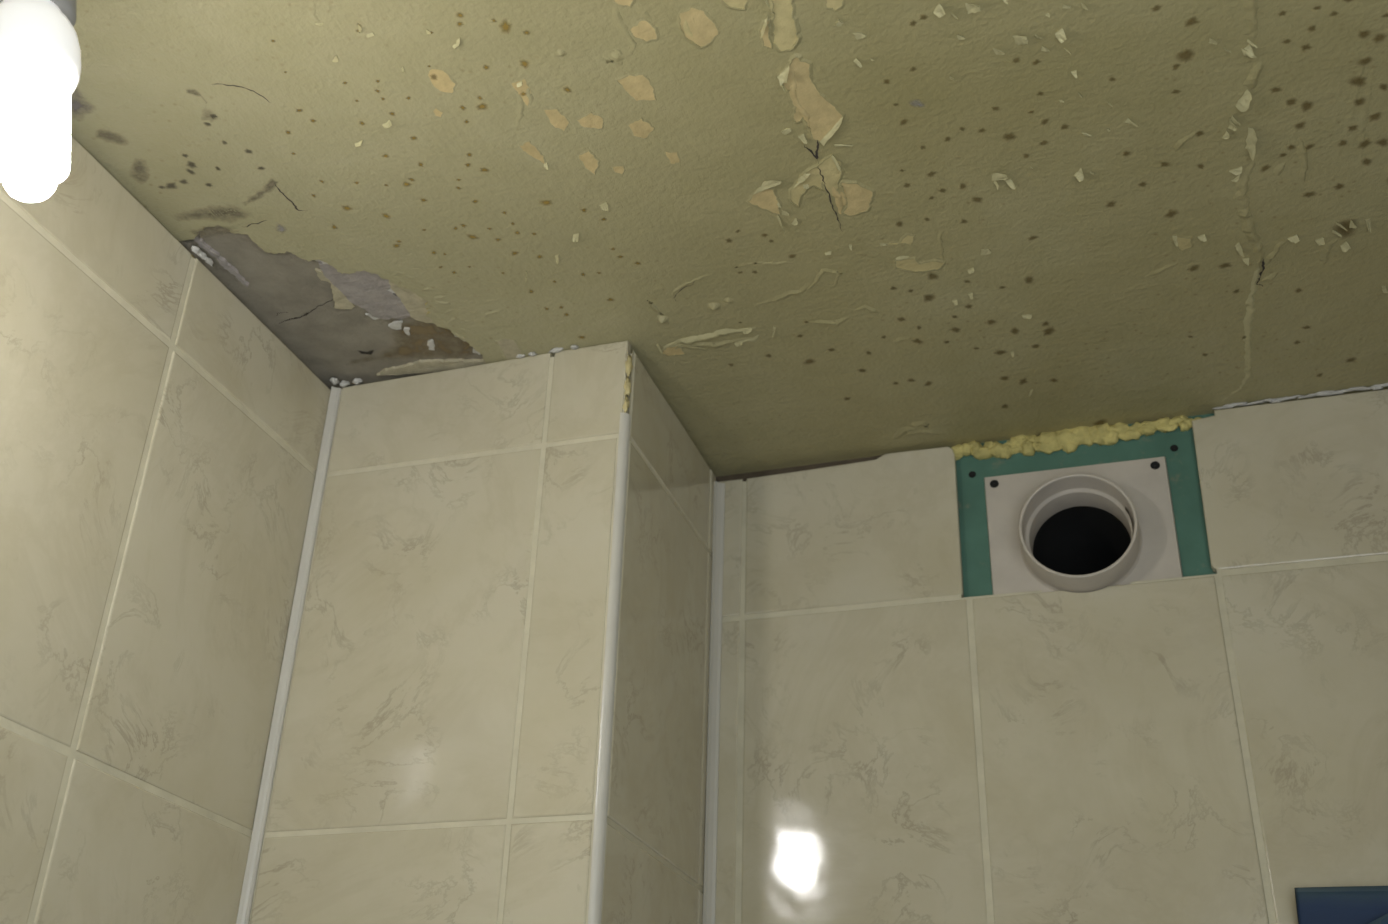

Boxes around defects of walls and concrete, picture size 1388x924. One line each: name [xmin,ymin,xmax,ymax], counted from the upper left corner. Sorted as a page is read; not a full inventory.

peeling [933,3,982,40]
peeling [993,3,1088,55]
damp [70,95,87,112]
peeling [427,68,458,118]
peeling [510,78,604,170]
peeling [605,0,876,234]
damp [159,154,220,189]
peeling [992,173,1016,190]
crack [1209,0,1351,402]
flaking render [179,225,486,390]
peeling [656,326,776,357]